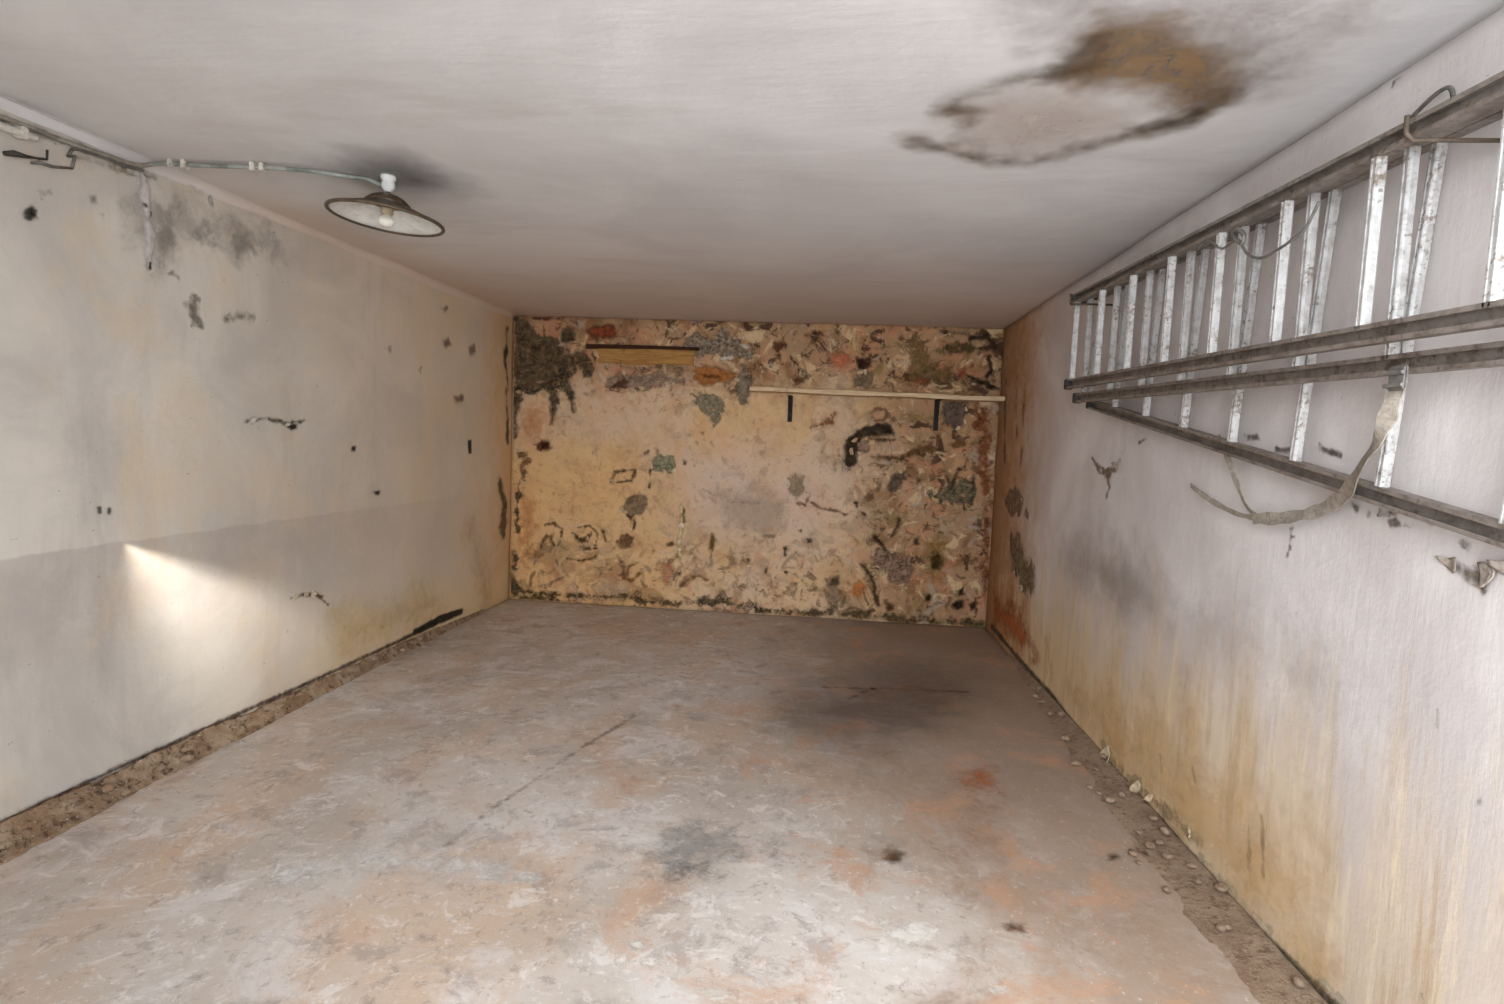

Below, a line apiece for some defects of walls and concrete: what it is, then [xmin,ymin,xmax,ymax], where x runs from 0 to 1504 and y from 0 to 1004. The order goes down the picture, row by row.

water stain [1048,20,1231,134]
water stain [137,171,156,269]
water stain [504,316,596,444]
flaking render [606,328,754,434]
flaking render [942,401,968,431]
water stain [498,479,507,539]
flaking render [513,449,531,533]
flaking render [572,451,686,550]
flaking render [887,469,976,507]
flaking render [1091,457,1121,498]
flaking render [859,518,918,611]
flaking render [1436,543,1504,594]